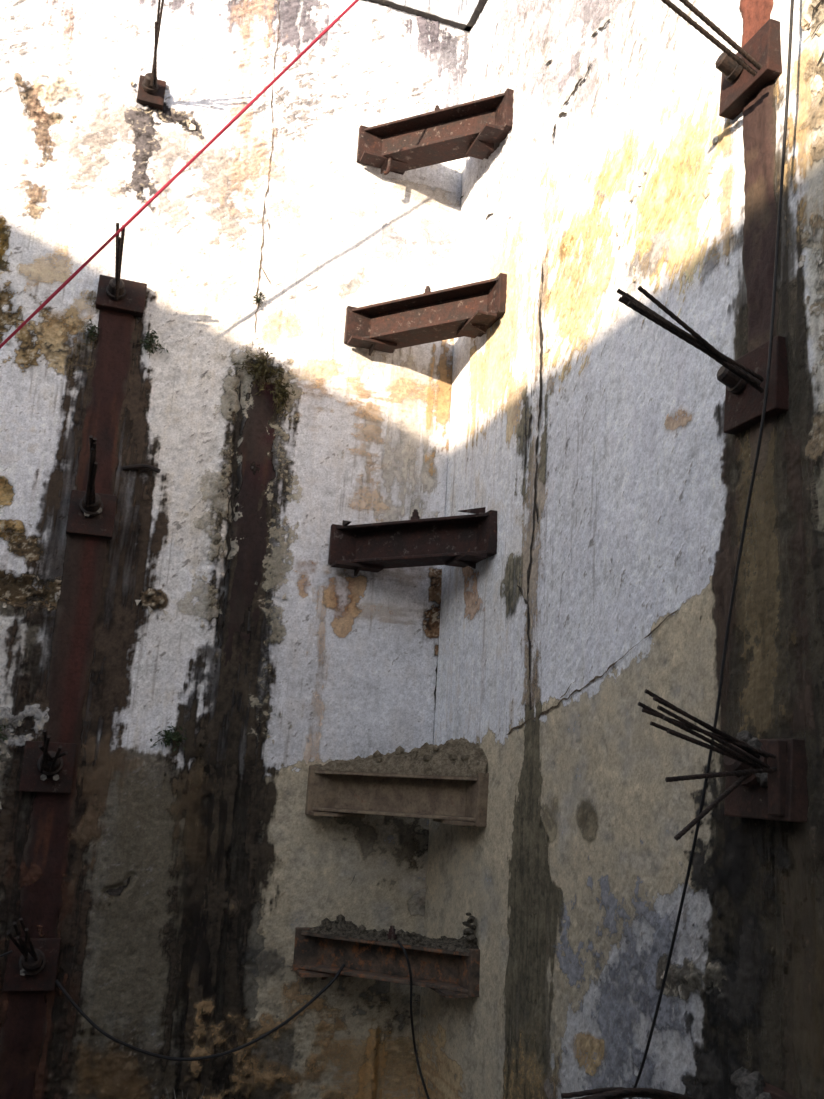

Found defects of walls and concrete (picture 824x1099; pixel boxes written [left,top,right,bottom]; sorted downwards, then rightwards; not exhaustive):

spalling [0,216,96,376]
damp [40,93,136,188]
damp [151,124,301,250]
peeling [535,60,730,392]
peeling [799,59,824,161]
spalling [0,476,62,618]
spalling [423,568,442,656]
crack [507,253,678,735]
damp [500,80,824,1099]
rust [712,438,742,746]
peeling [805,403,824,462]
damp [159,347,308,1099]